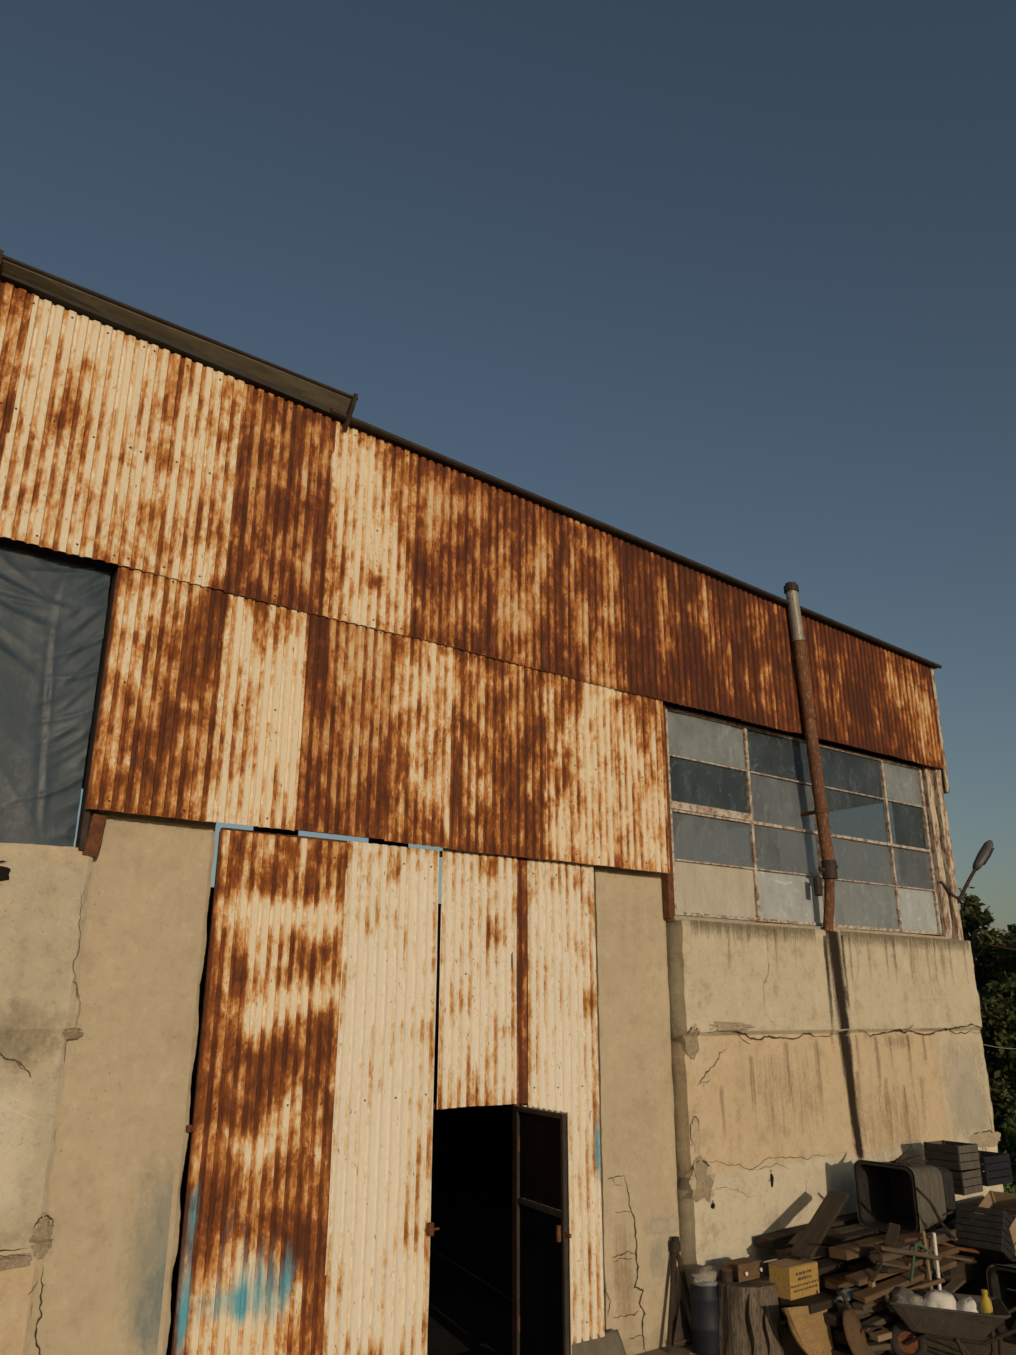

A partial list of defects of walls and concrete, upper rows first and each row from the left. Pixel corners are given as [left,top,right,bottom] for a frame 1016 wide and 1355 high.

crack [0,1053,31,1077]
crack [700,948,986,1084]
spalling [689,1116,715,1203]
crack [708,1152,844,1199]
crack [0,1248,44,1355]
crack [606,1175,646,1352]